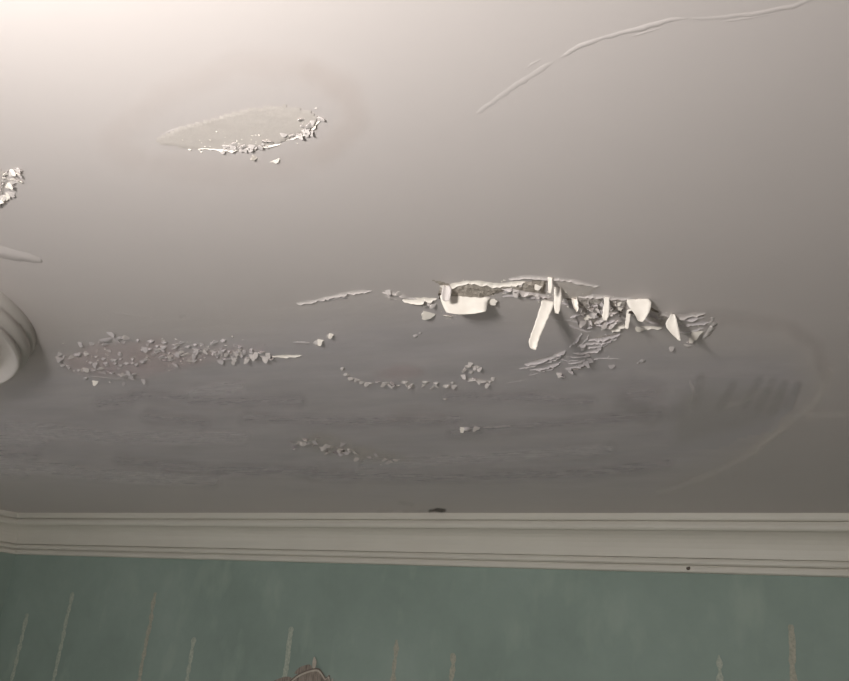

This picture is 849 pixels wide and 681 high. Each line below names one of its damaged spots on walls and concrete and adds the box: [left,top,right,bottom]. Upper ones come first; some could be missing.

peeling [0,168,23,206]
peeling [382,275,718,378]
damp [0,287,827,513]